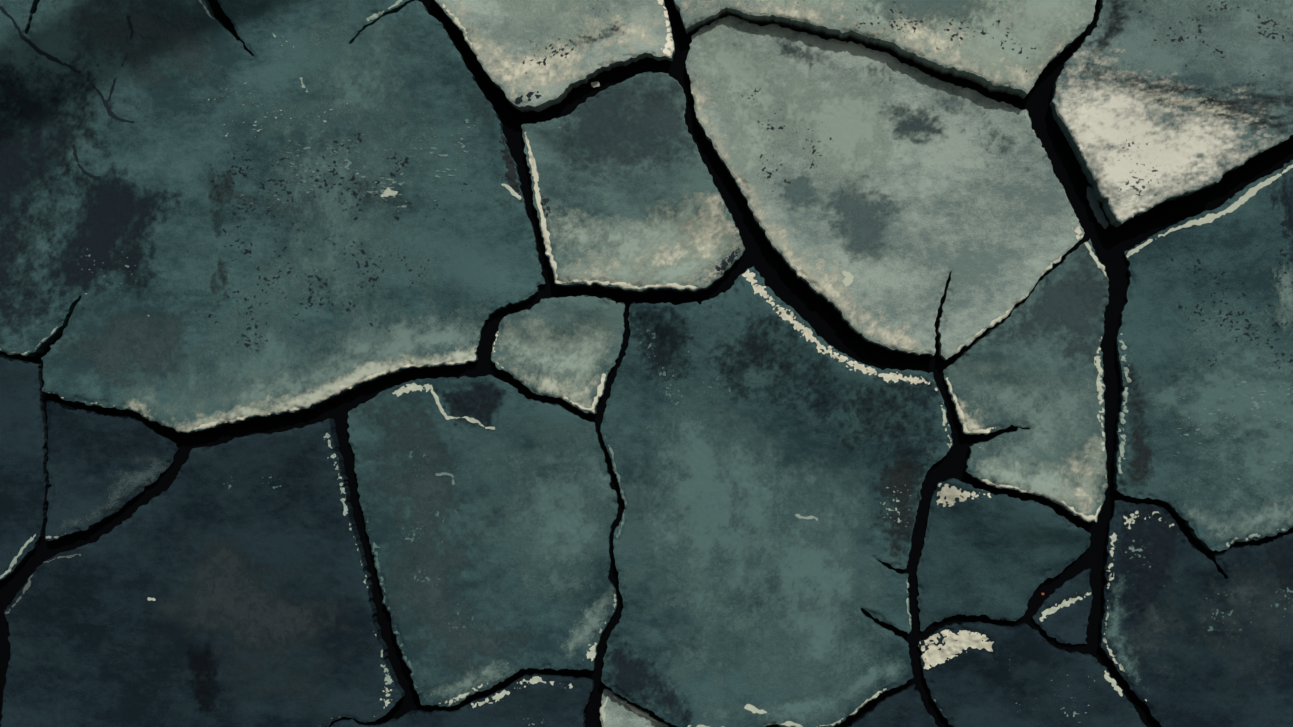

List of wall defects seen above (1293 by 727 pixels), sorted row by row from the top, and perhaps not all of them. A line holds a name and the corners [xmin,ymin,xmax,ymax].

crack [0,2,135,122]
crack [208,0,254,57]
crack [72,144,101,180]
crack [418,0,1293,727]
crack [0,247,762,727]